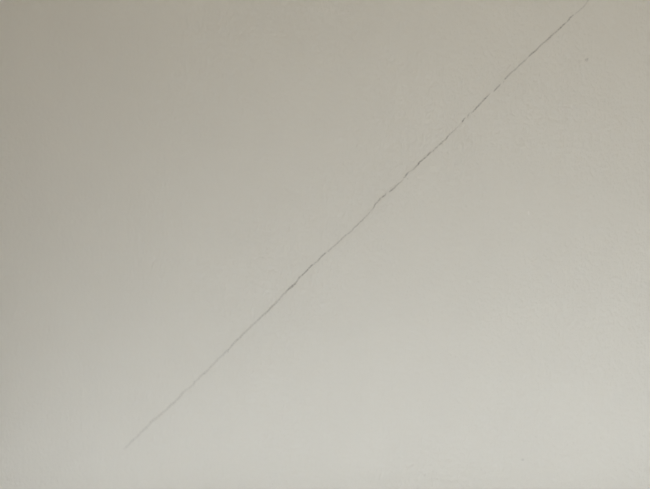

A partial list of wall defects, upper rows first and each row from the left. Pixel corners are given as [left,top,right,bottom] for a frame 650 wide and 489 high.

crack [122,0,590,451]